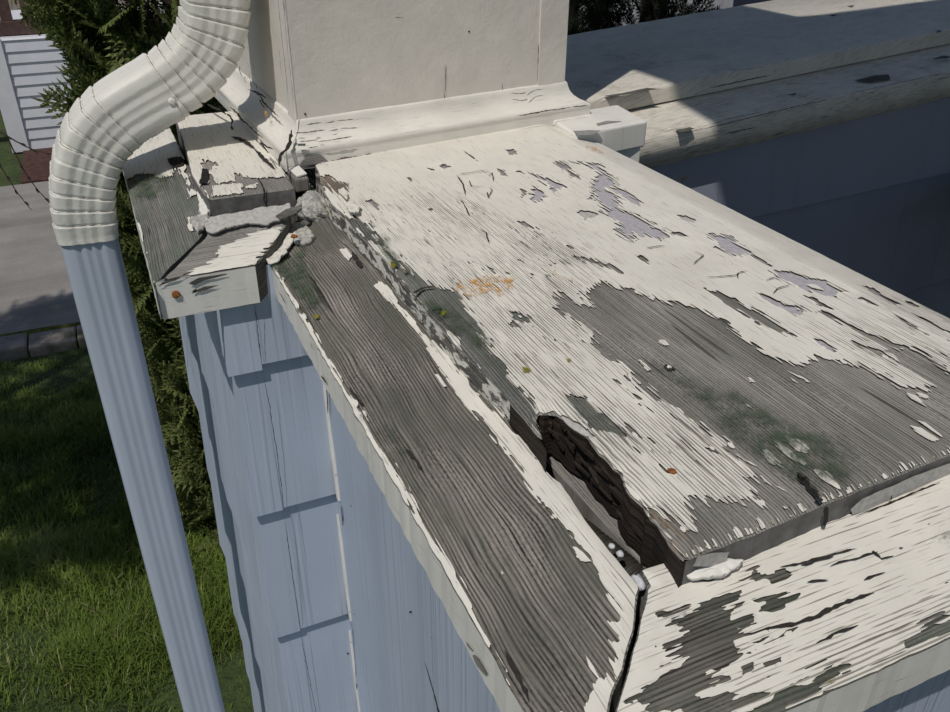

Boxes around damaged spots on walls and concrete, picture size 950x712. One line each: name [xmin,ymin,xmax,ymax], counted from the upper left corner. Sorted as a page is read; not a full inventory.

crack [208,5,367,207]
peeling [606,88,656,97]
peeling [854,74,890,83]
peeling [201,160,294,200]
peeling [298,144,349,195]
peeling [497,168,564,202]
peeling [554,162,685,243]
rust [457,276,513,296]
peeling [346,216,541,440]
peeling [552,232,950,567]
peeling [624,567,850,712]
peeling [904,612,950,648]